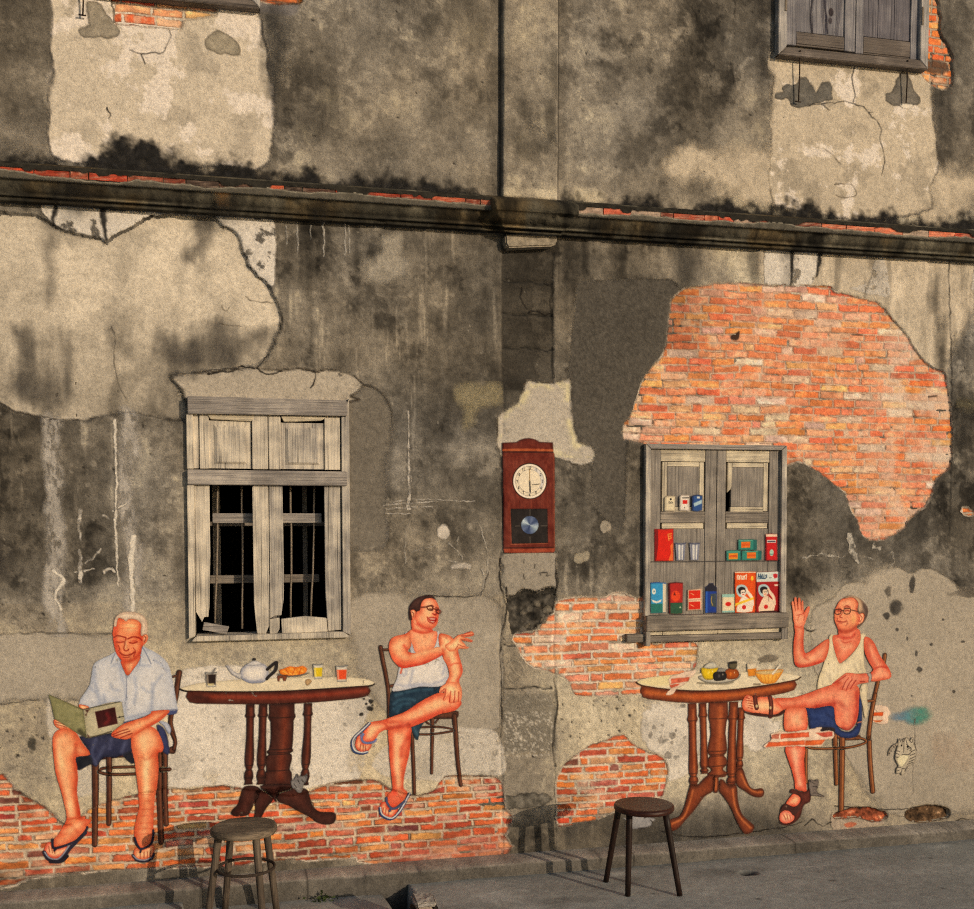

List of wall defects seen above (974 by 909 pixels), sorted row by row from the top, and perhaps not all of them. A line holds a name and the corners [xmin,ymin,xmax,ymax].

water stain [0,119,58,165]
peeling [46,0,302,170]
water stain [85,134,479,195]
crack [809,67,885,169]
peeling [768,0,952,221]
spalling [0,211,283,421]
flaking render [622,282,953,541]
efflorescence [112,406,142,612]
flaking render [506,574,699,697]
flaking render [0,735,668,889]